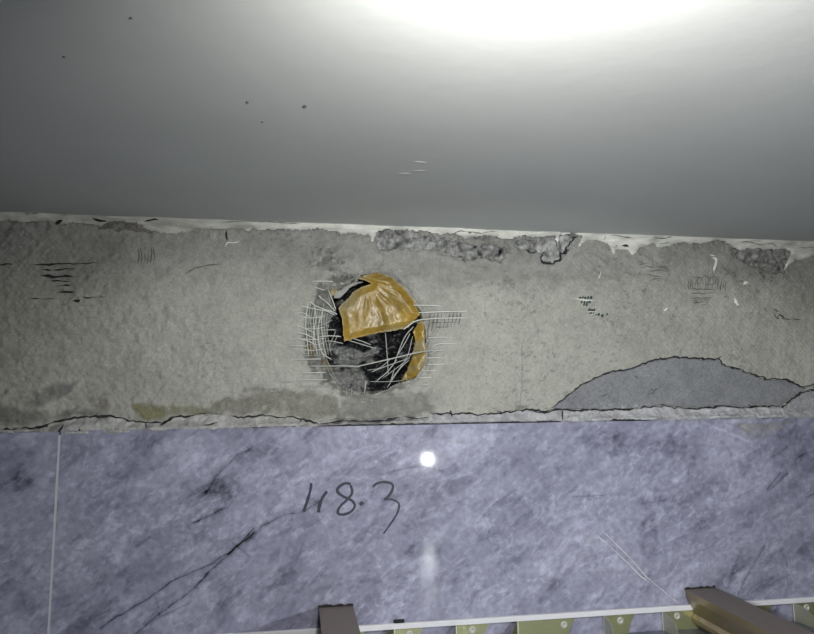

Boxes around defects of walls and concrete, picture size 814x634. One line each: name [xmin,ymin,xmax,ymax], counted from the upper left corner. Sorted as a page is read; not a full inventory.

flaking render [375,229,574,263]
flaking render [723,241,791,274]
spalling [305,246,439,404]
flaking render [554,358,814,422]
crack [4,412,318,432]